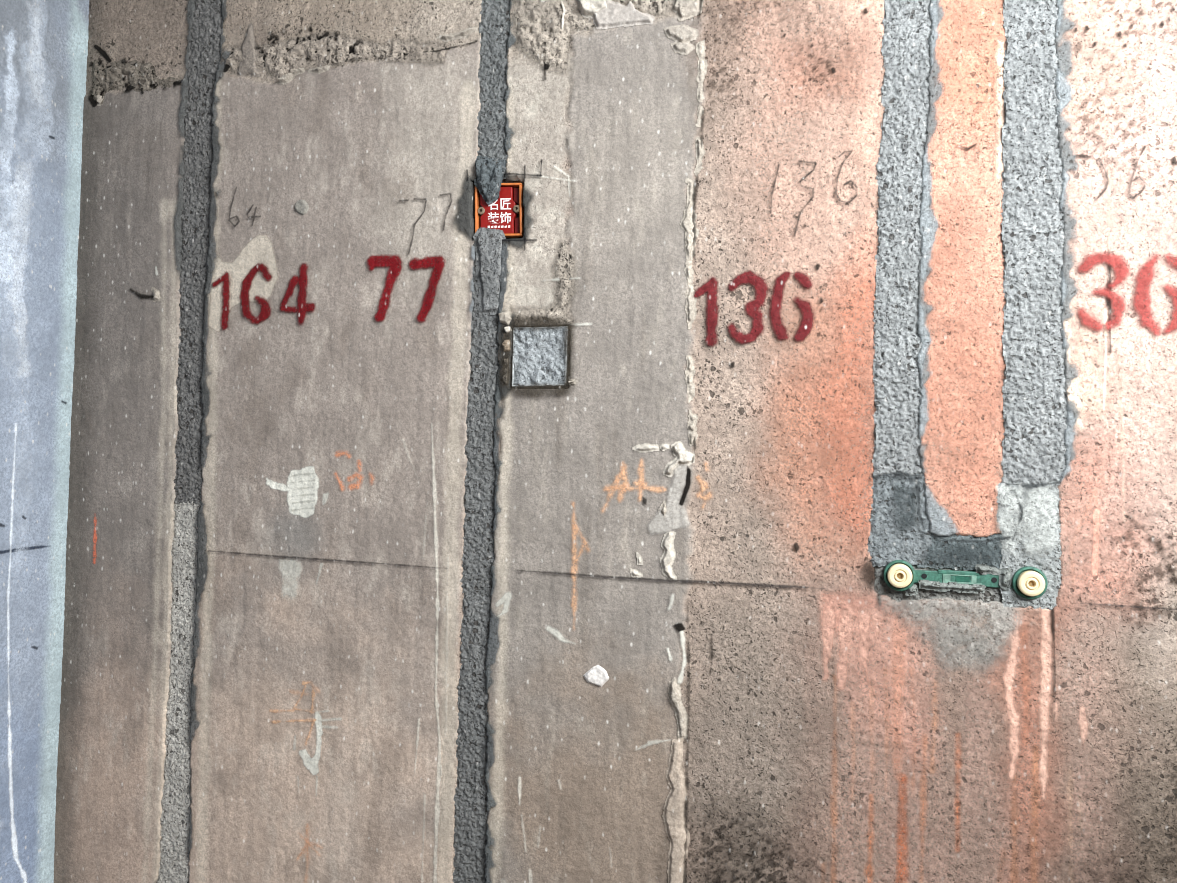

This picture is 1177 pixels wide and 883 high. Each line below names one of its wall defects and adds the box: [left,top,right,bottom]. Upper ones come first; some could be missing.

spalling [498,240,591,333]
peeling [511,0,708,329]
corrosion [832,607,1046,883]
corrosion [1070,759,1103,883]